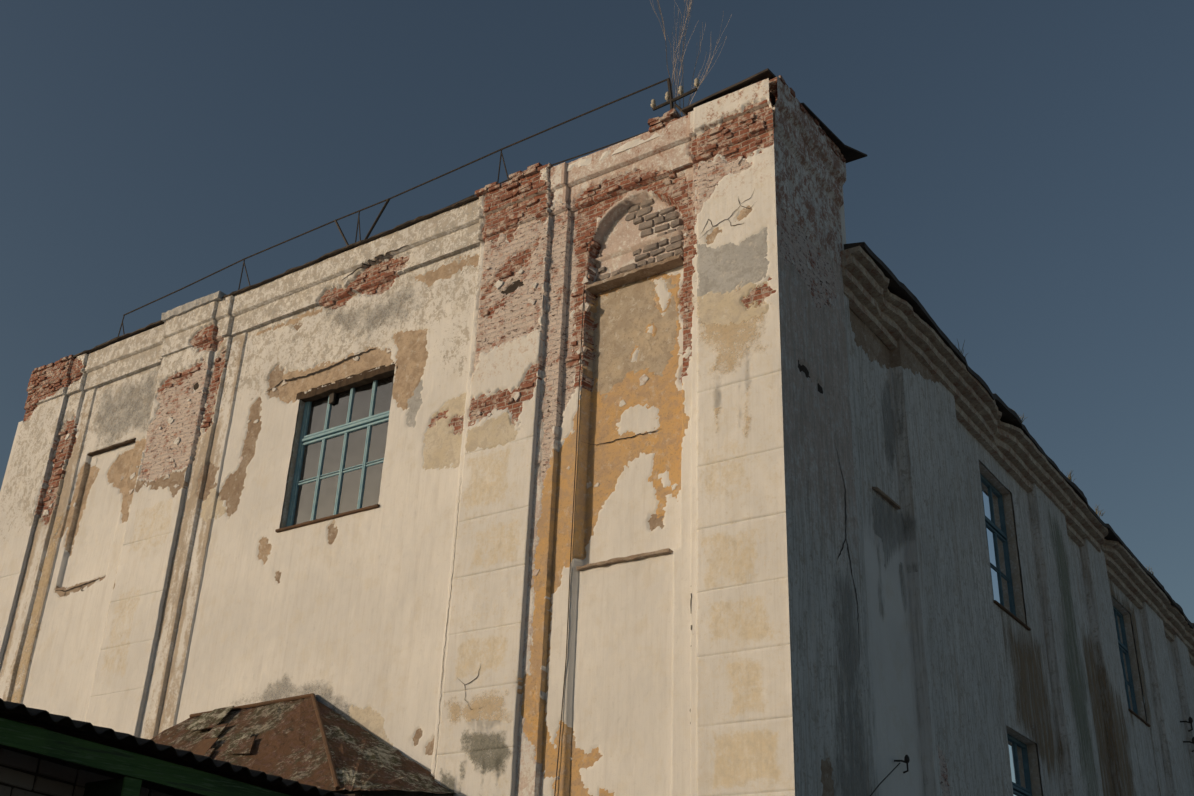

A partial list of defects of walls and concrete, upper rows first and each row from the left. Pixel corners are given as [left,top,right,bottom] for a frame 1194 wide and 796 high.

crack [702,189,756,232]
peeling [35,98,837,556]
peeling [849,307,939,383]
spalling [23,358,85,422]
peeling [53,575,115,597]
peeling [529,544,554,719]
leakage [440,697,510,796]